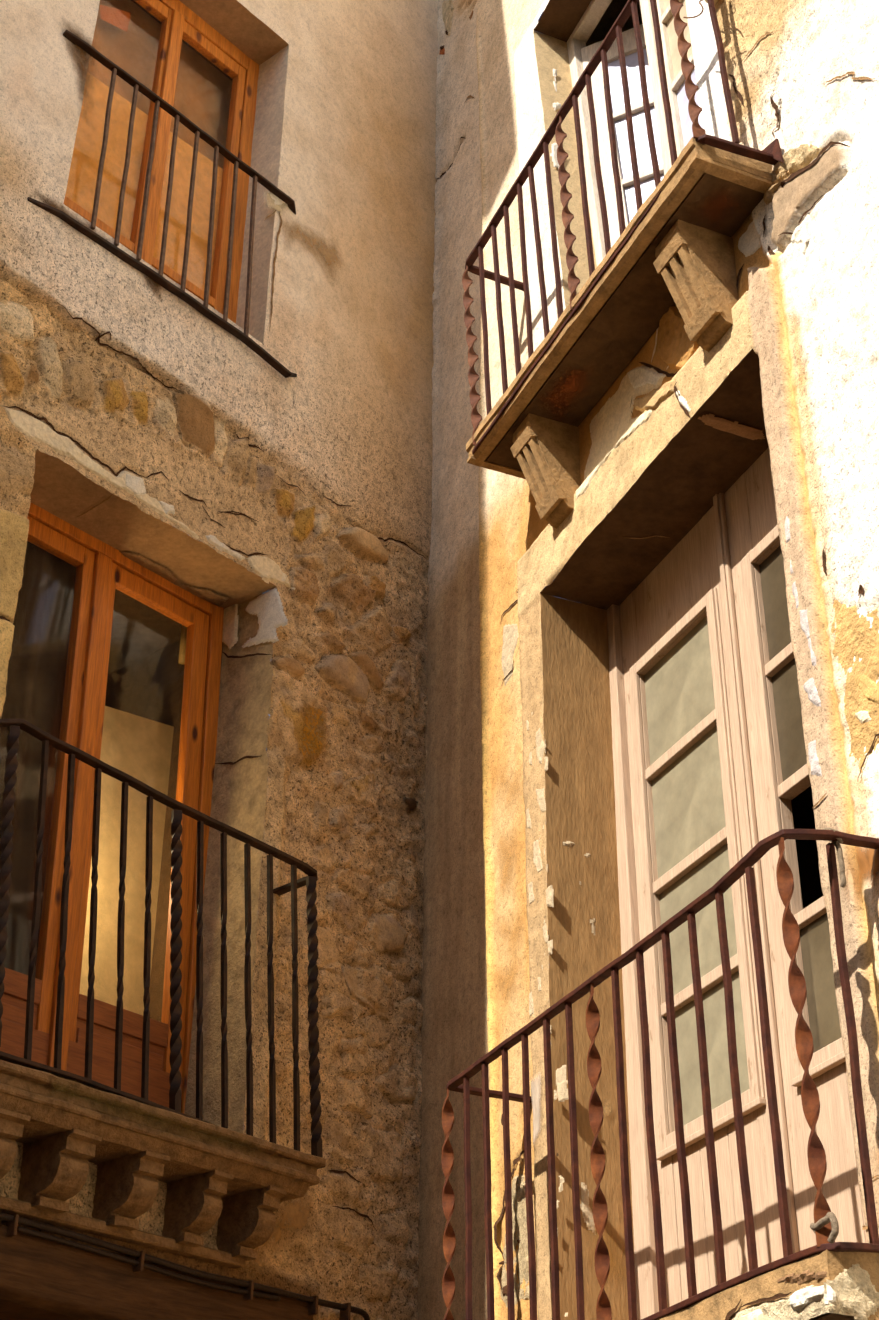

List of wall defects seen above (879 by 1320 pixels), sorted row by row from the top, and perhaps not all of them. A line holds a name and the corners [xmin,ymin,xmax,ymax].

flaking render [763,144,824,205]
peeling [738,219,761,257]
peeling [781,224,812,254]
peeling [575,365,765,499]
peeling [790,560,821,707]
flaking render [826,596,879,773]
peeling [808,740,822,777]
spalling [731,1264,879,1320]